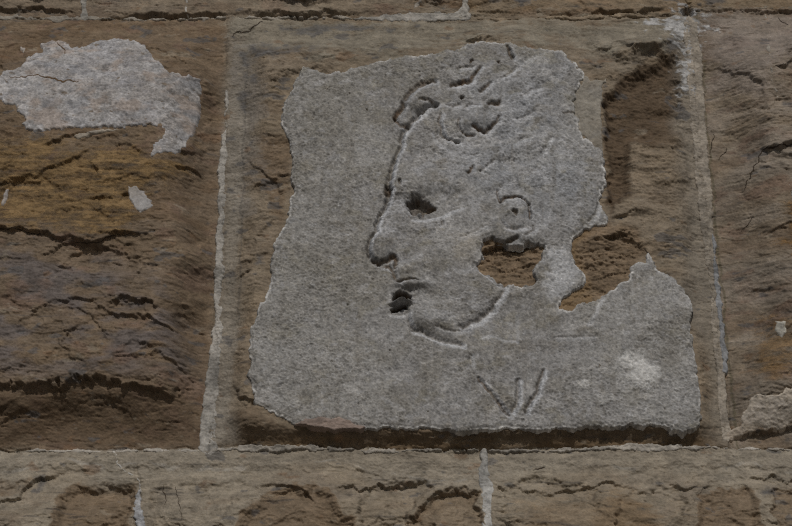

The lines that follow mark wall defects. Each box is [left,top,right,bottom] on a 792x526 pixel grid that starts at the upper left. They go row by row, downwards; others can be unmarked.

crack [10,74,78,83]
spalling [559,50,686,311]
crack [744,143,792,190]
spalling [477,239,544,288]